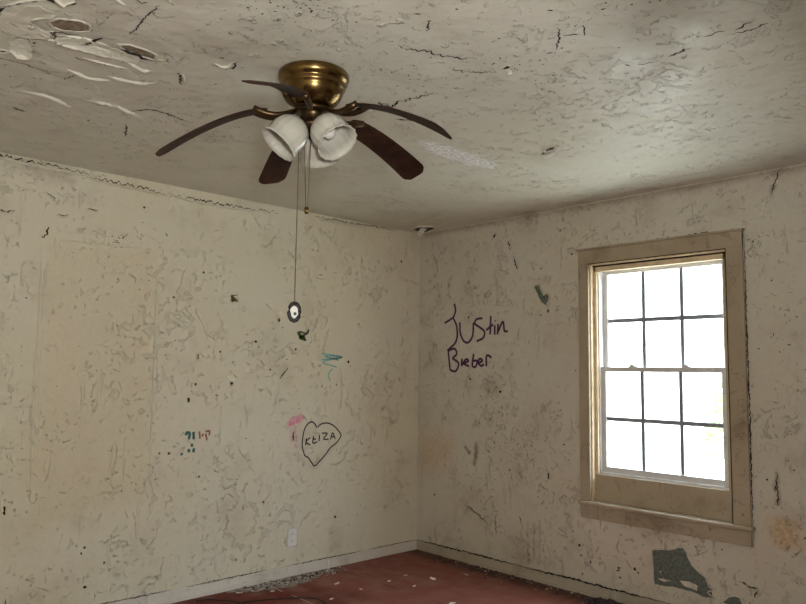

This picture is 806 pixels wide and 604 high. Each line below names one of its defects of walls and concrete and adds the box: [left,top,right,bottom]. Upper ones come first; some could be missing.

peeling [0,0,169,70]
spalling [651,546,753,604]